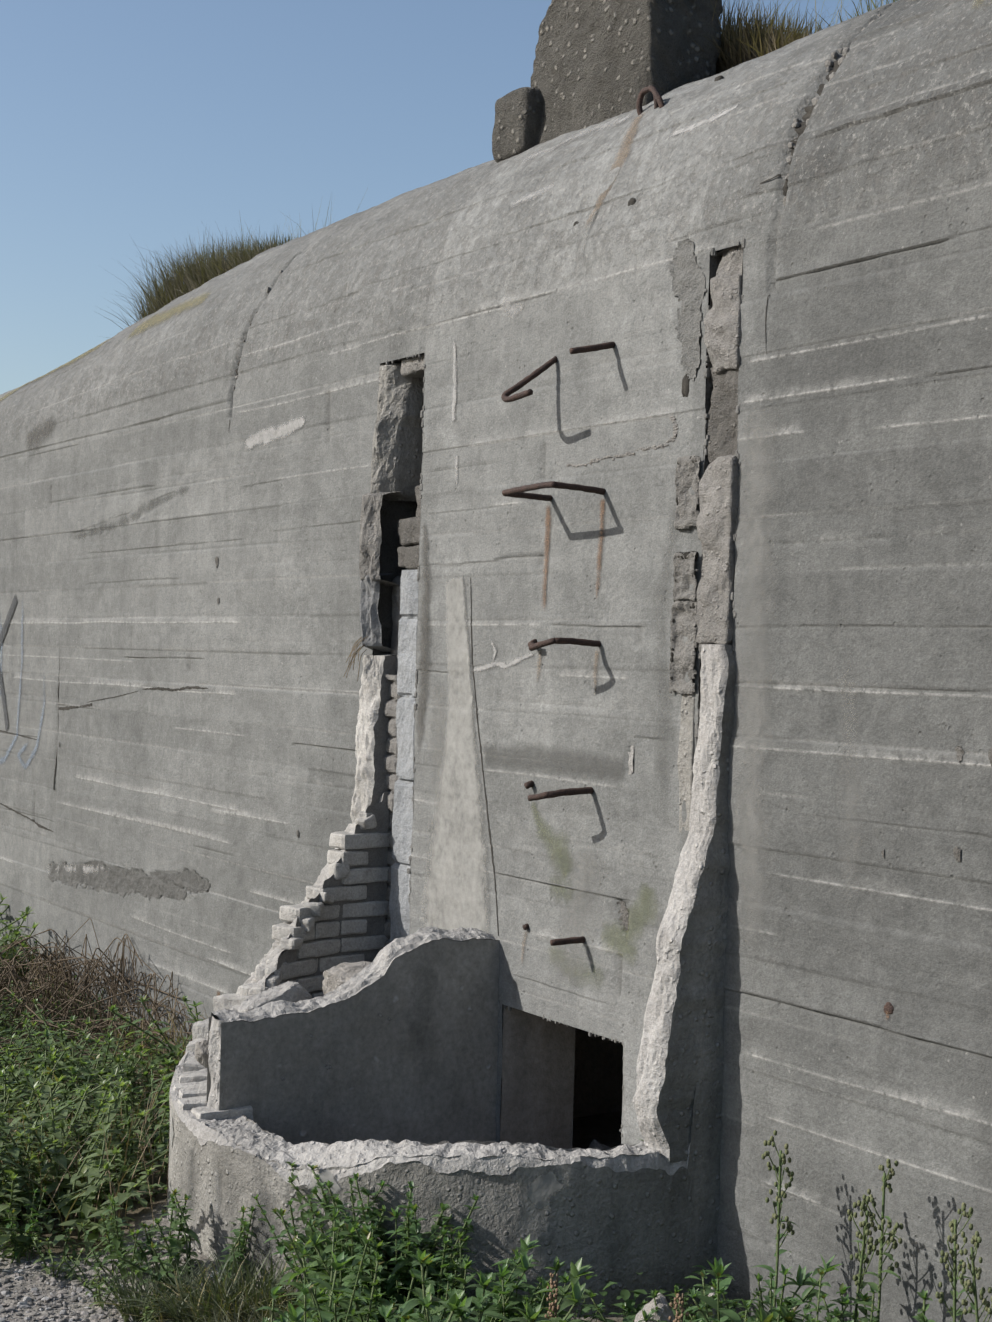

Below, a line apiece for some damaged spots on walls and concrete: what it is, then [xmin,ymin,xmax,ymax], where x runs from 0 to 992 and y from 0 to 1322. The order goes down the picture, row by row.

crack [760,14,881,210]
crack [233,270,284,389]
spalling [669,238,717,381]
spalling [386,351,426,437]
peeling [566,416,678,467]
spalling [350,655,385,824]
spalling [48,860,210,901]
spalling [587,592,736,1163]
spalling [209,927,499,1025]